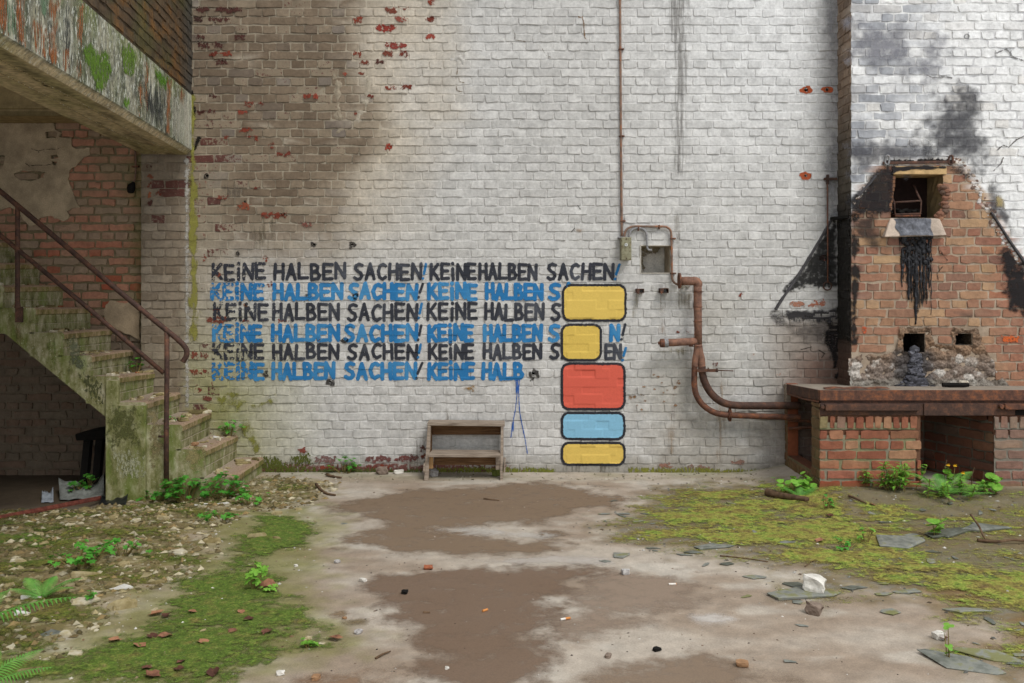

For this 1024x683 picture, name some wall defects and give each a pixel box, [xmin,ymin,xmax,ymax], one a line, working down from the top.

water stain [62,2,74,68]
peeling [194,6,245,65]
peeling [343,6,409,76]
water stain [142,75,164,130]
peeling [217,195,287,219]
spalling [933,184,953,221]
spalling [848,326,1009,386]
water stain [106,406,136,449]